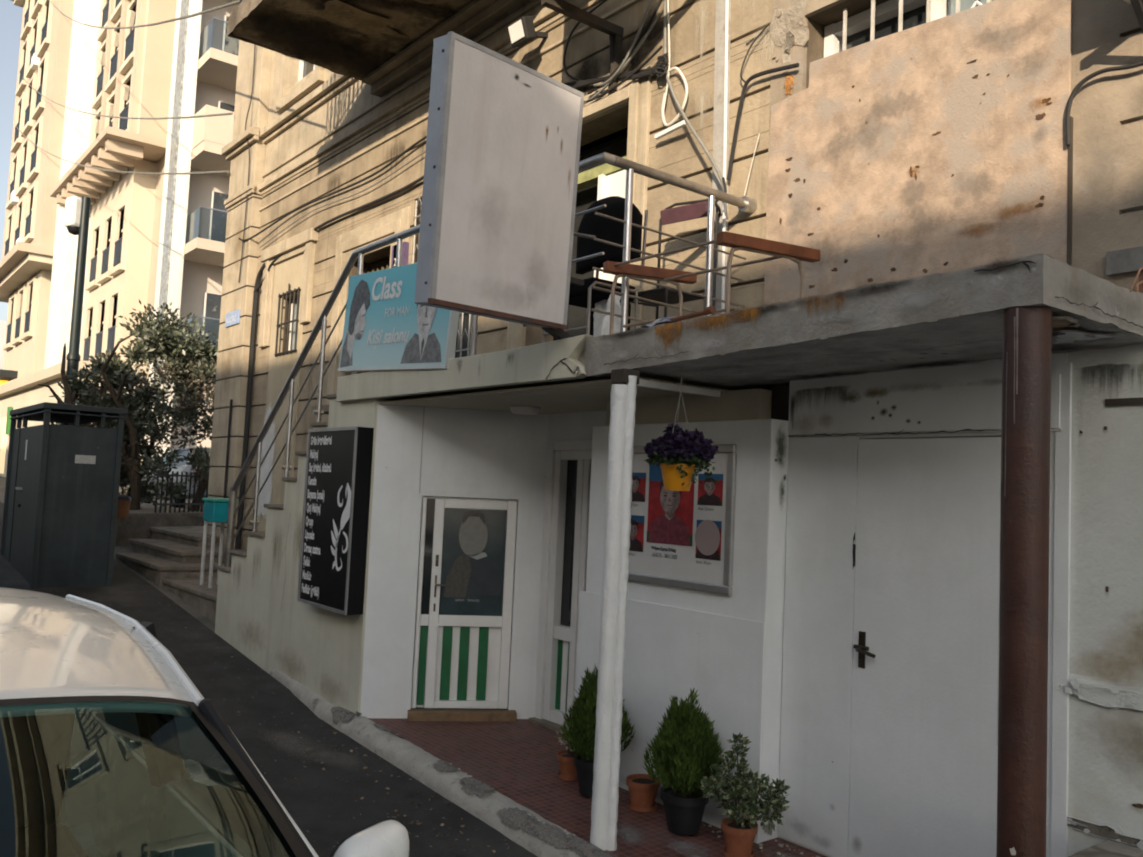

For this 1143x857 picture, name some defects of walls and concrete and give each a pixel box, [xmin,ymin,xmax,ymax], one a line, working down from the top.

damp [307,0,456,19]
damp [252,13,388,93]
flaking render [770,0,809,78]
rust [784,73,795,95]
rust [655,308,758,350]
damp [758,360,896,420]
peeling [1055,678,1143,711]